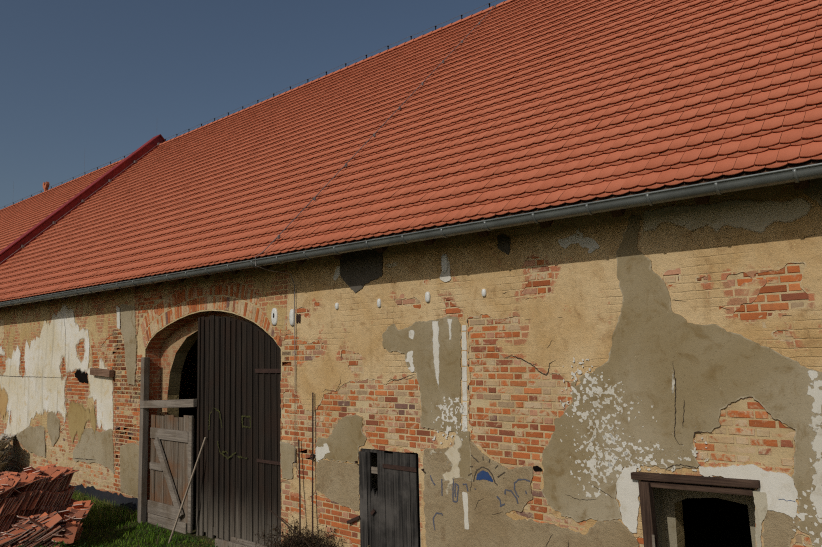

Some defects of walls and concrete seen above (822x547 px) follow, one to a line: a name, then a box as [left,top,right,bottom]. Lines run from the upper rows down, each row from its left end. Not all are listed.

flaking render [5,281,324,494]
flaking render [394,294,425,309]
flaking render [281,298,796,547]
flaking render [726,263,809,342]